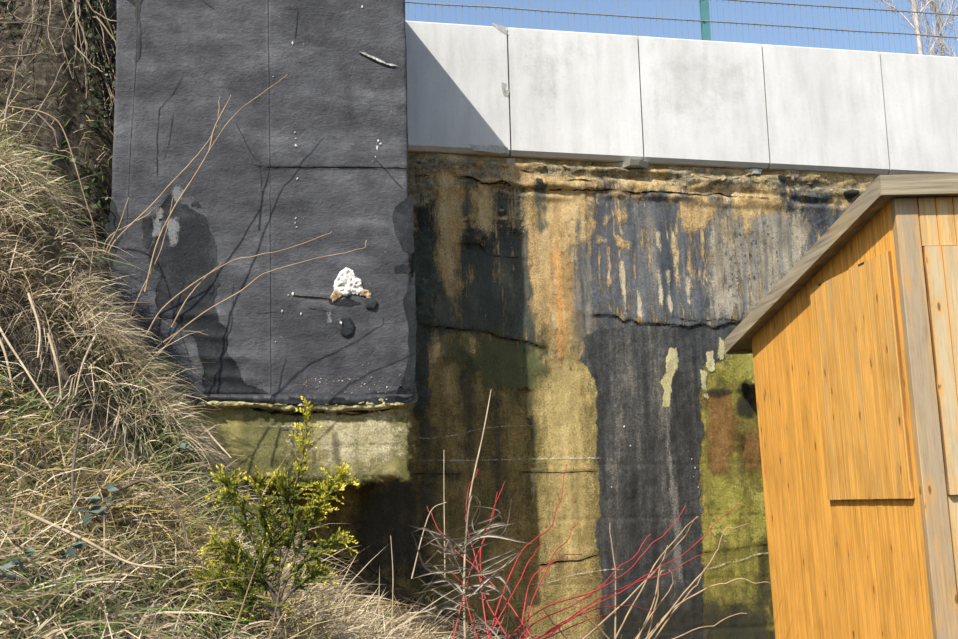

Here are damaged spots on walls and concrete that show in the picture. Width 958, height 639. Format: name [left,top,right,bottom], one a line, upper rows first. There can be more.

peeling [128,0,142,62]
crack [236,123,835,200]
crack [432,326,542,348]
crack [594,314,737,329]
leakage [459,164,852,584]